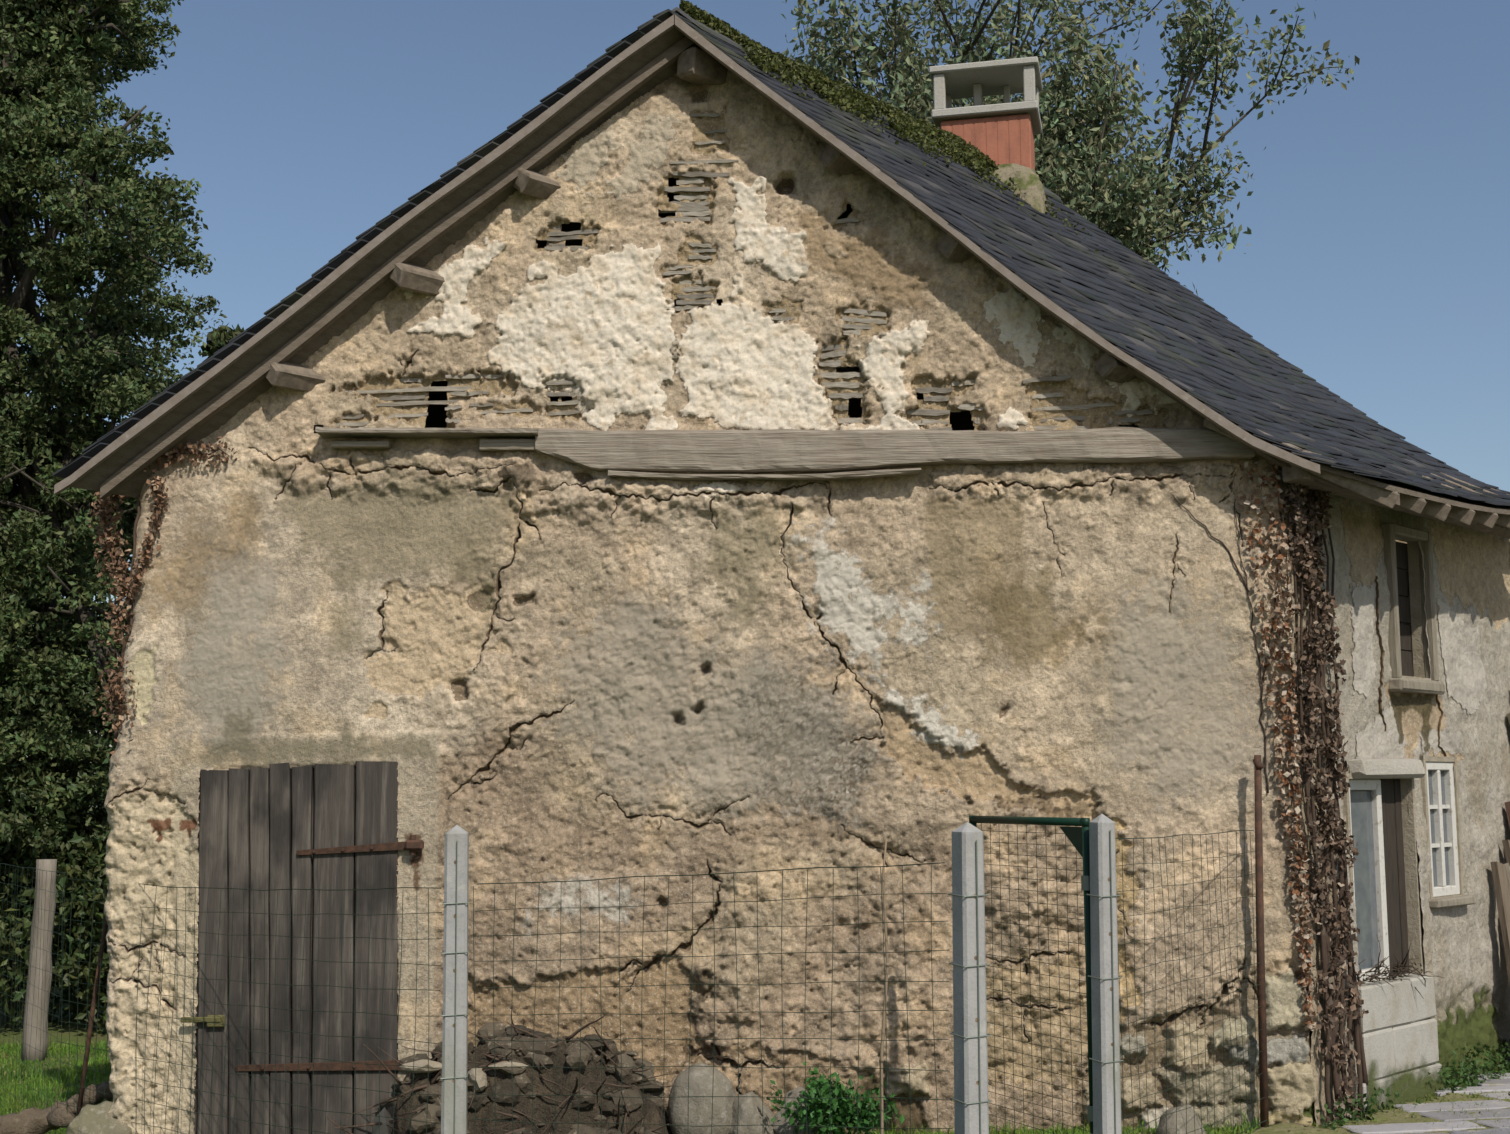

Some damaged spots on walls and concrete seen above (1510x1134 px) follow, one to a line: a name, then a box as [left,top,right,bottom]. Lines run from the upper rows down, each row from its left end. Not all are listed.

peeling [407,176,930,431]
peeling [978,283,1100,369]
peeling [997,406,1028,430]
crack [248,445,884,744]
water stain [557,517,984,827]
peeling [1351,519,1510,765]
crack [446,699,577,801]
corrosion [147,818,197,842]
water stain [525,874,636,937]
crack [594,790,749,993]
crack [986,949,1071,1041]
crack [1141,958,1258,1031]